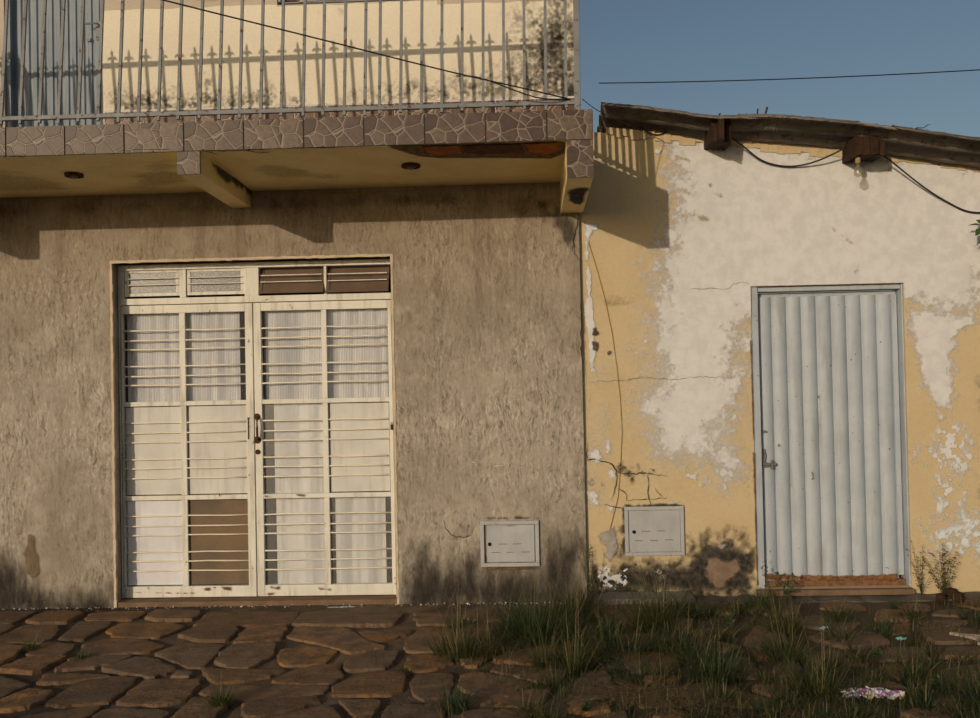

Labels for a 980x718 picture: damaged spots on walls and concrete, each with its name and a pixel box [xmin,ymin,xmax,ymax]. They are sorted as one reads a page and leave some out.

leakage [514,0,574,96]
peeling [584,224,599,373]
peeling [628,141,980,557]
peeling [587,440,611,463]
peeling [585,470,615,513]
leakage [0,535,106,609]
leakage [405,504,755,604]
spalling [589,528,628,590]